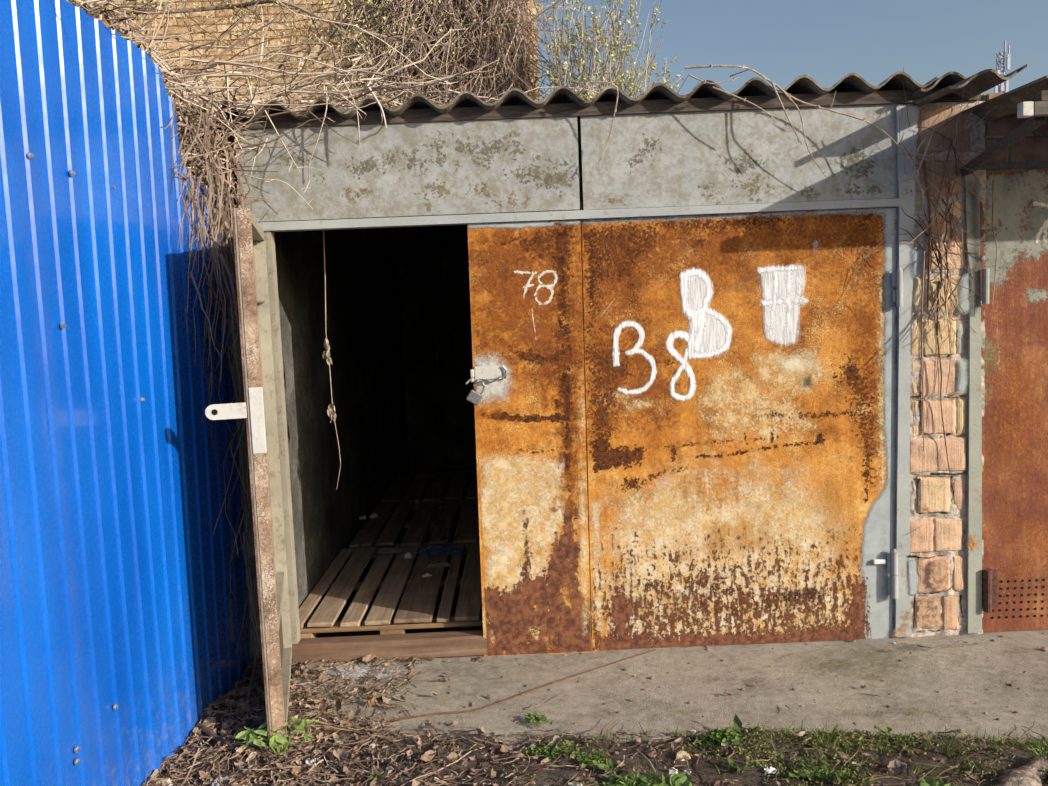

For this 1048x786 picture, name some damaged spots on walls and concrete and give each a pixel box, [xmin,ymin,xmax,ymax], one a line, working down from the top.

peeling [982,170,1048,287]
peeling [1026,289,1048,303]
rust [469,209,886,656]